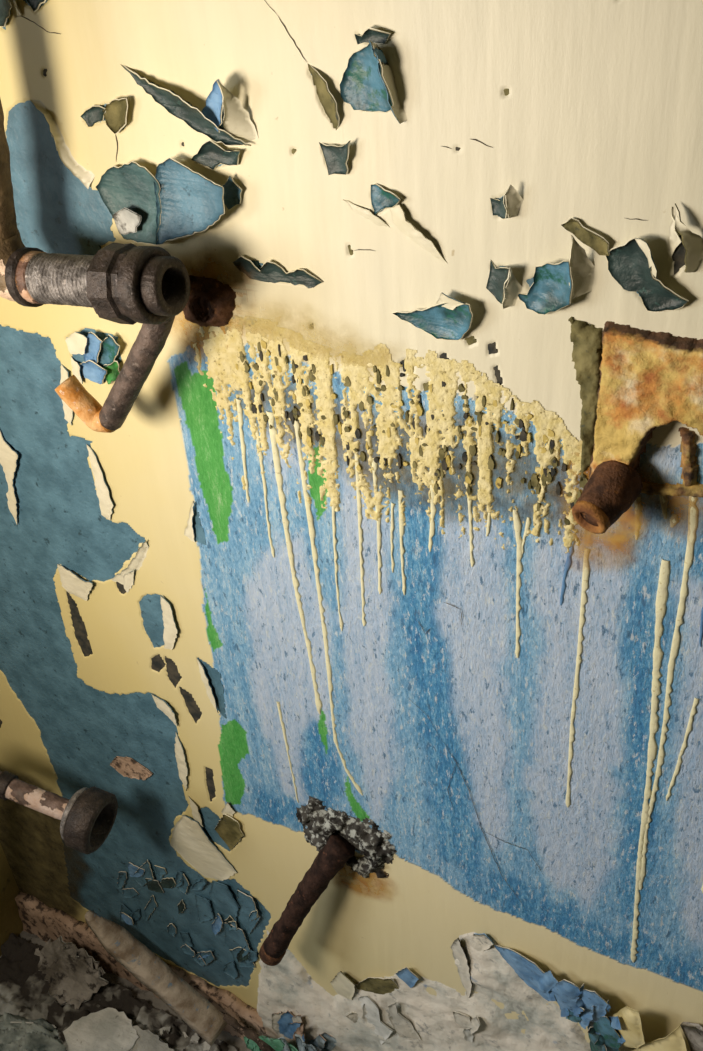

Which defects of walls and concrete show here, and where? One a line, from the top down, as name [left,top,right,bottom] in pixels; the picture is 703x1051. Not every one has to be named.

crack [264,0,306,61]
peeling [308,27,407,130]
peeling [5,64,259,255]
corrosion [180,257,236,352]
peeling [233,255,323,288]
peeling [486,218,689,315]
water stain [255,411,363,803]
peeling [0,293,703,1051]
water stain [355,449,406,626]
water stain [513,510,531,658]
corrosion [579,427,703,556]
water stain [630,495,699,963]